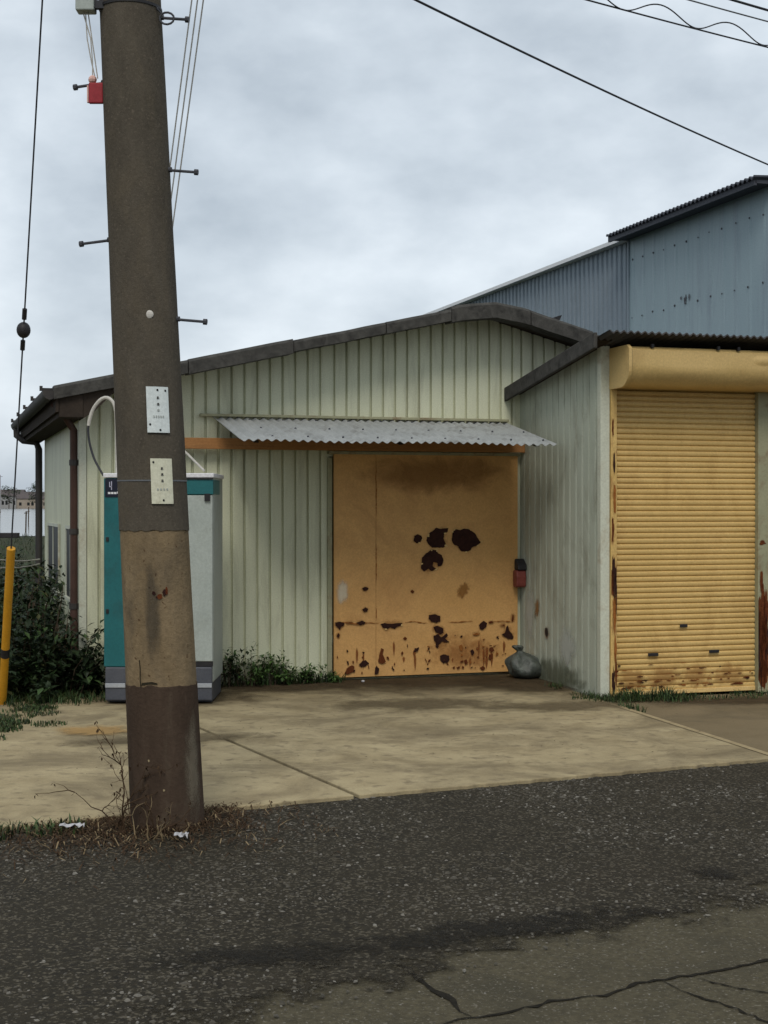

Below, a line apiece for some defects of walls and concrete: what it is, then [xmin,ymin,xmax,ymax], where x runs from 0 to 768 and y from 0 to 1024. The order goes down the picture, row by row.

corrosion [335,607,514,674]
corrosion [611,556,768,691]
crack [395,958,768,1024]